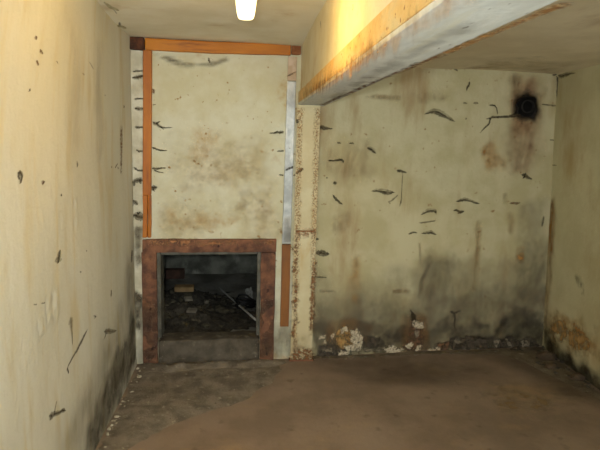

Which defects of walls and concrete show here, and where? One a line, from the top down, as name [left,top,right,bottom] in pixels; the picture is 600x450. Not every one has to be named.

rust [447,3,569,53]
crack [480,105,520,133]
rust [290,56,437,360]
crack [67,316,96,374]
damp [90,292,151,450]
damp [316,310,477,353]